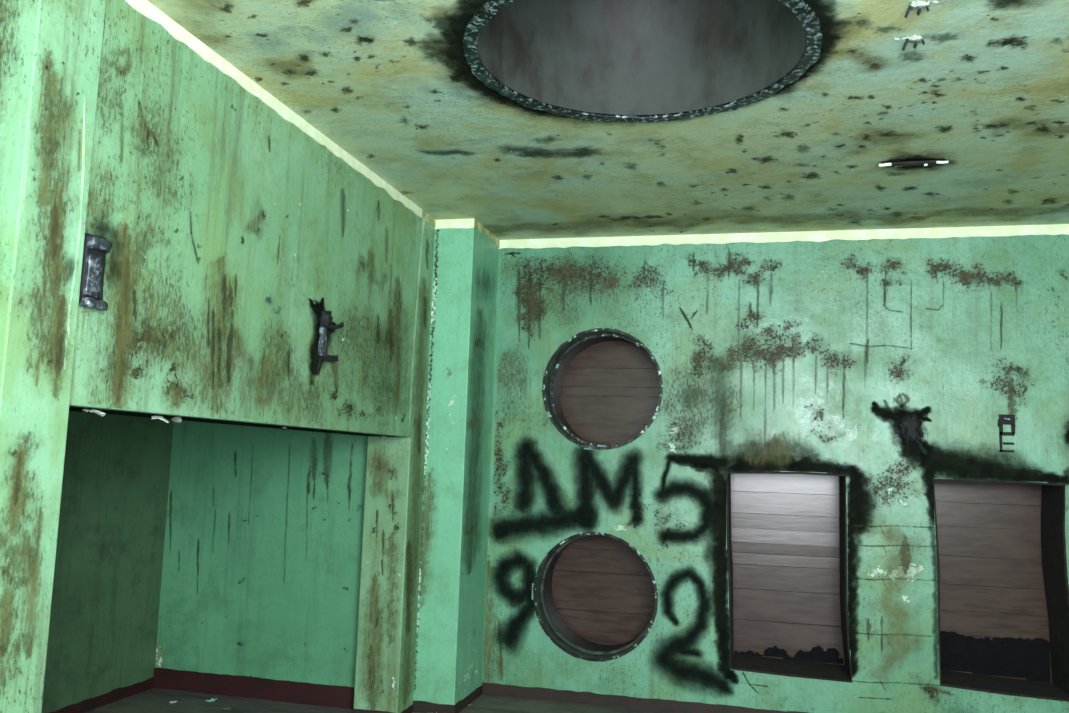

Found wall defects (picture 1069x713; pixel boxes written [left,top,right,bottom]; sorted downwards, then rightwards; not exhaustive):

rust [36,157,73,398]
rust [105,224,179,408]
rust [161,256,243,414]
damp [496,350,527,422]
damp [659,361,742,478]
rust [9,446,26,530]
rust [371,452,399,575]